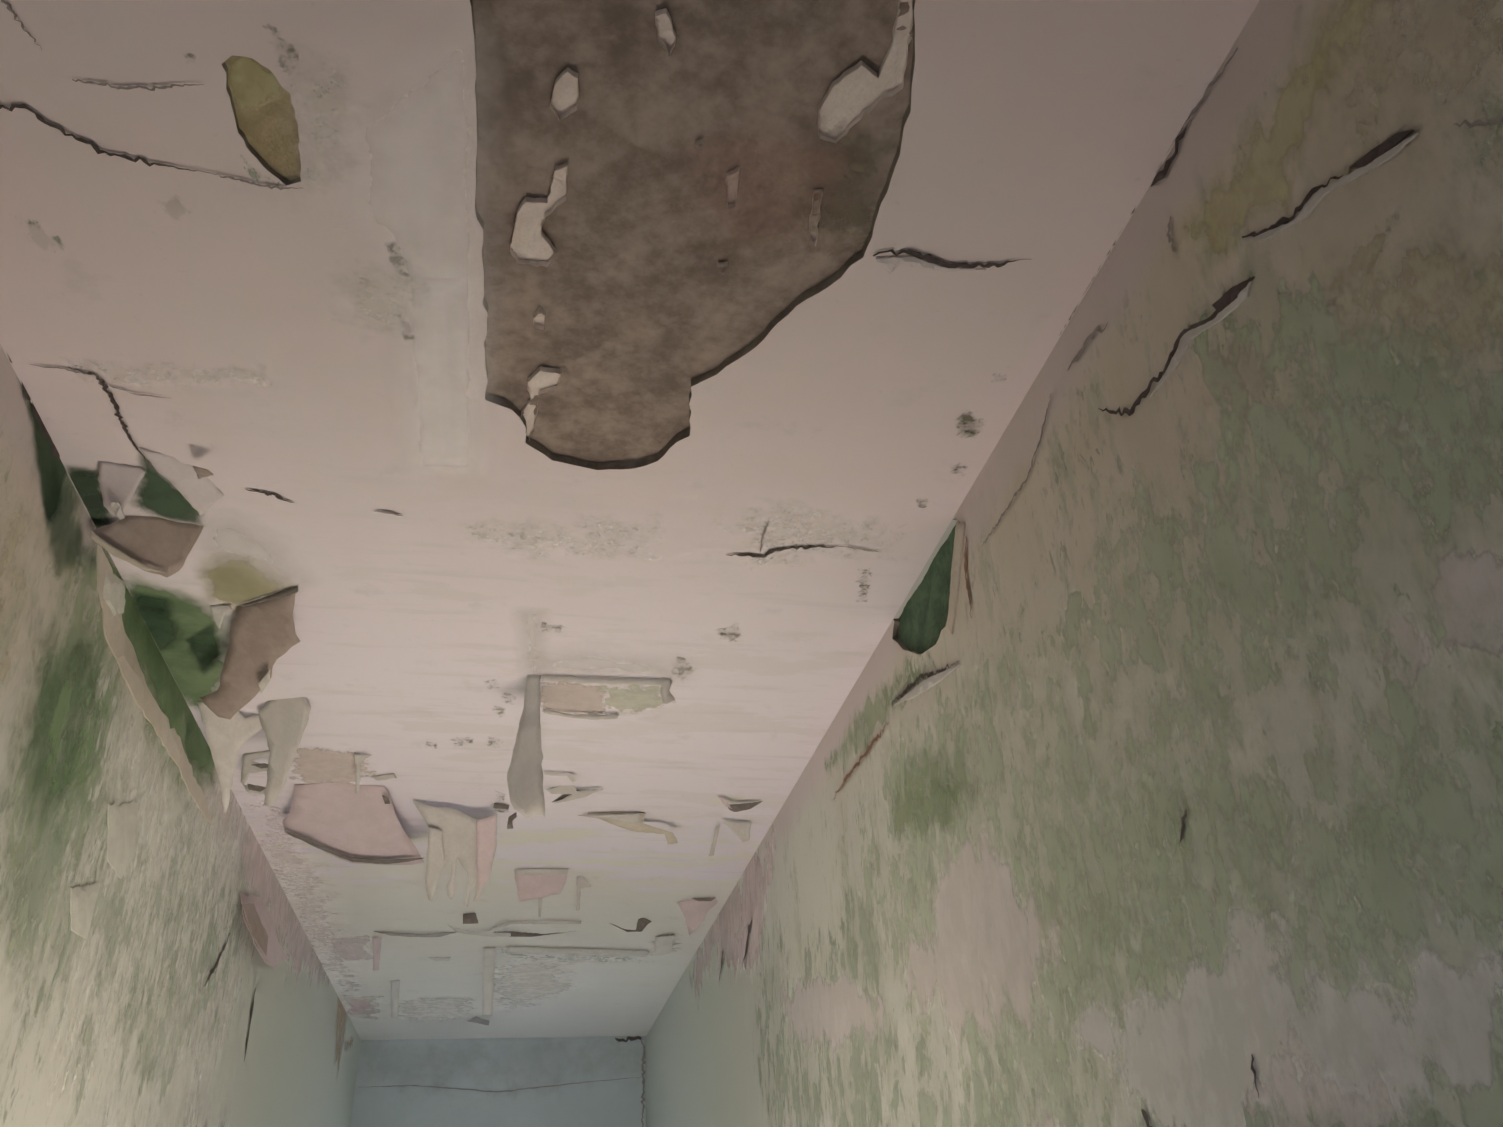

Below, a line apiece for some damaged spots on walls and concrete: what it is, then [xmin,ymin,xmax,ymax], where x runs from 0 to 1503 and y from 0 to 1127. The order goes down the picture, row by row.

crack [72,79,204,91]
crack [0,104,304,190]
spalling [222,49,301,185]
spalling [470,0,915,470]
crack [873,249,1023,274]
crack [982,47,1238,546]
crack [1098,113,1503,416]
damp [0,400,278,1094]
peeling [69,448,678,1044]
peeling [678,796,775,992]
spalling [892,619,920,655]
damp [756,257,1503,1127]